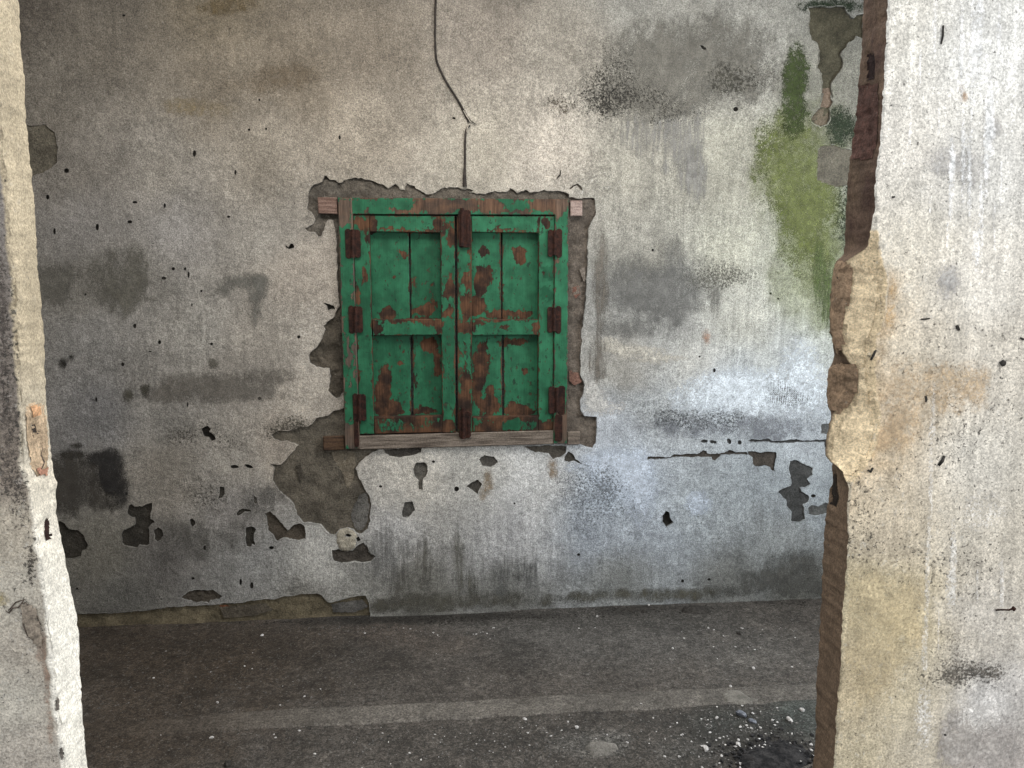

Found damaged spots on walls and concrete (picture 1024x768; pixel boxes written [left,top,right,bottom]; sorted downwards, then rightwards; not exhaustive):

leakage [544,15,783,200]
peeling [807,5,863,128]
flaking render [816,83,879,189]
spalling [236,175,598,564]
spalling [820,259,881,475]
spalling [58,520,89,560]
leakage [51,443,128,516]
spalling [121,492,164,549]
spalling [662,511,674,528]
spalling [778,459,828,523]